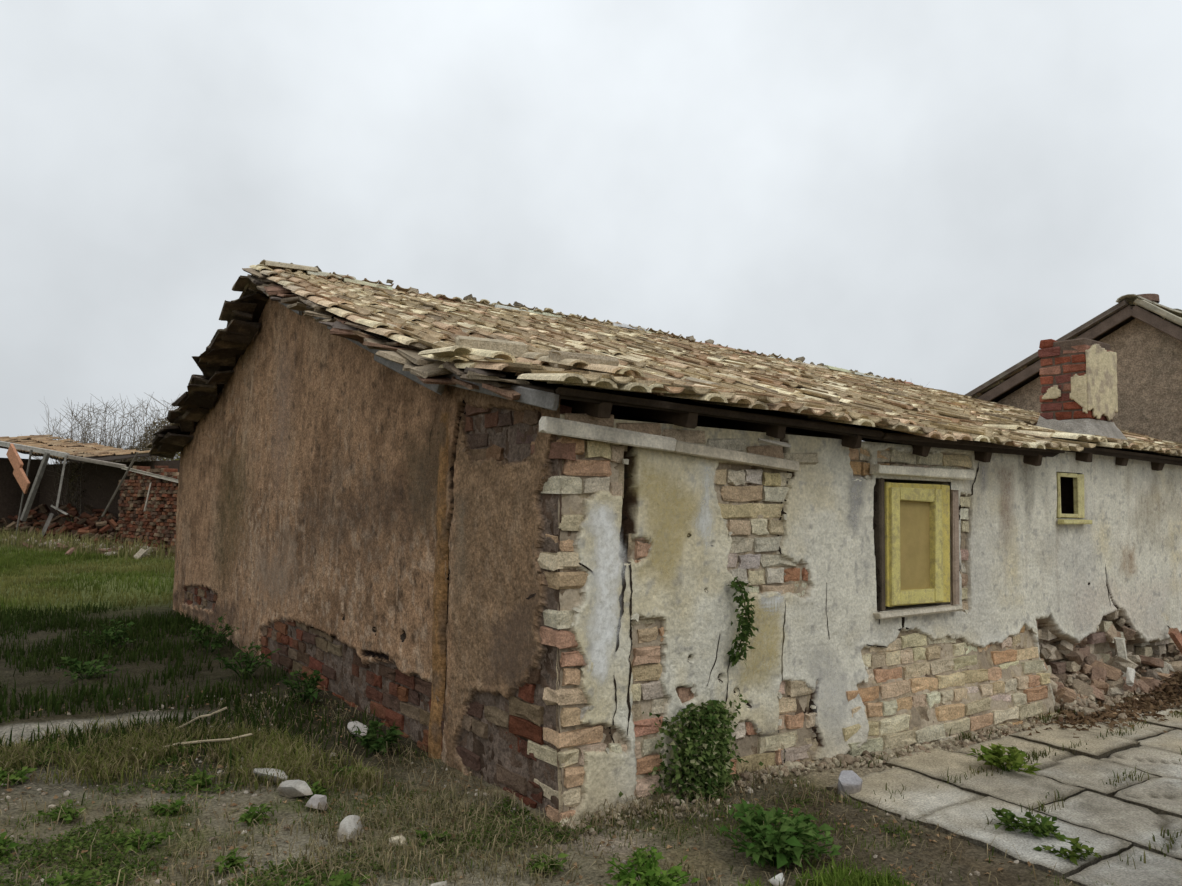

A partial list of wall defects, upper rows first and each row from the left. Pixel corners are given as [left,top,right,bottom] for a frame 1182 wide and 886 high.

spalling [461,403,542,464]
spalling [714,465,809,596]
spalling [184,586,218,611]
spalling [259,436,697,823]
crack [579,562,633,743]
spalling [724,680,820,774]
spalling [842,608,1182,757]